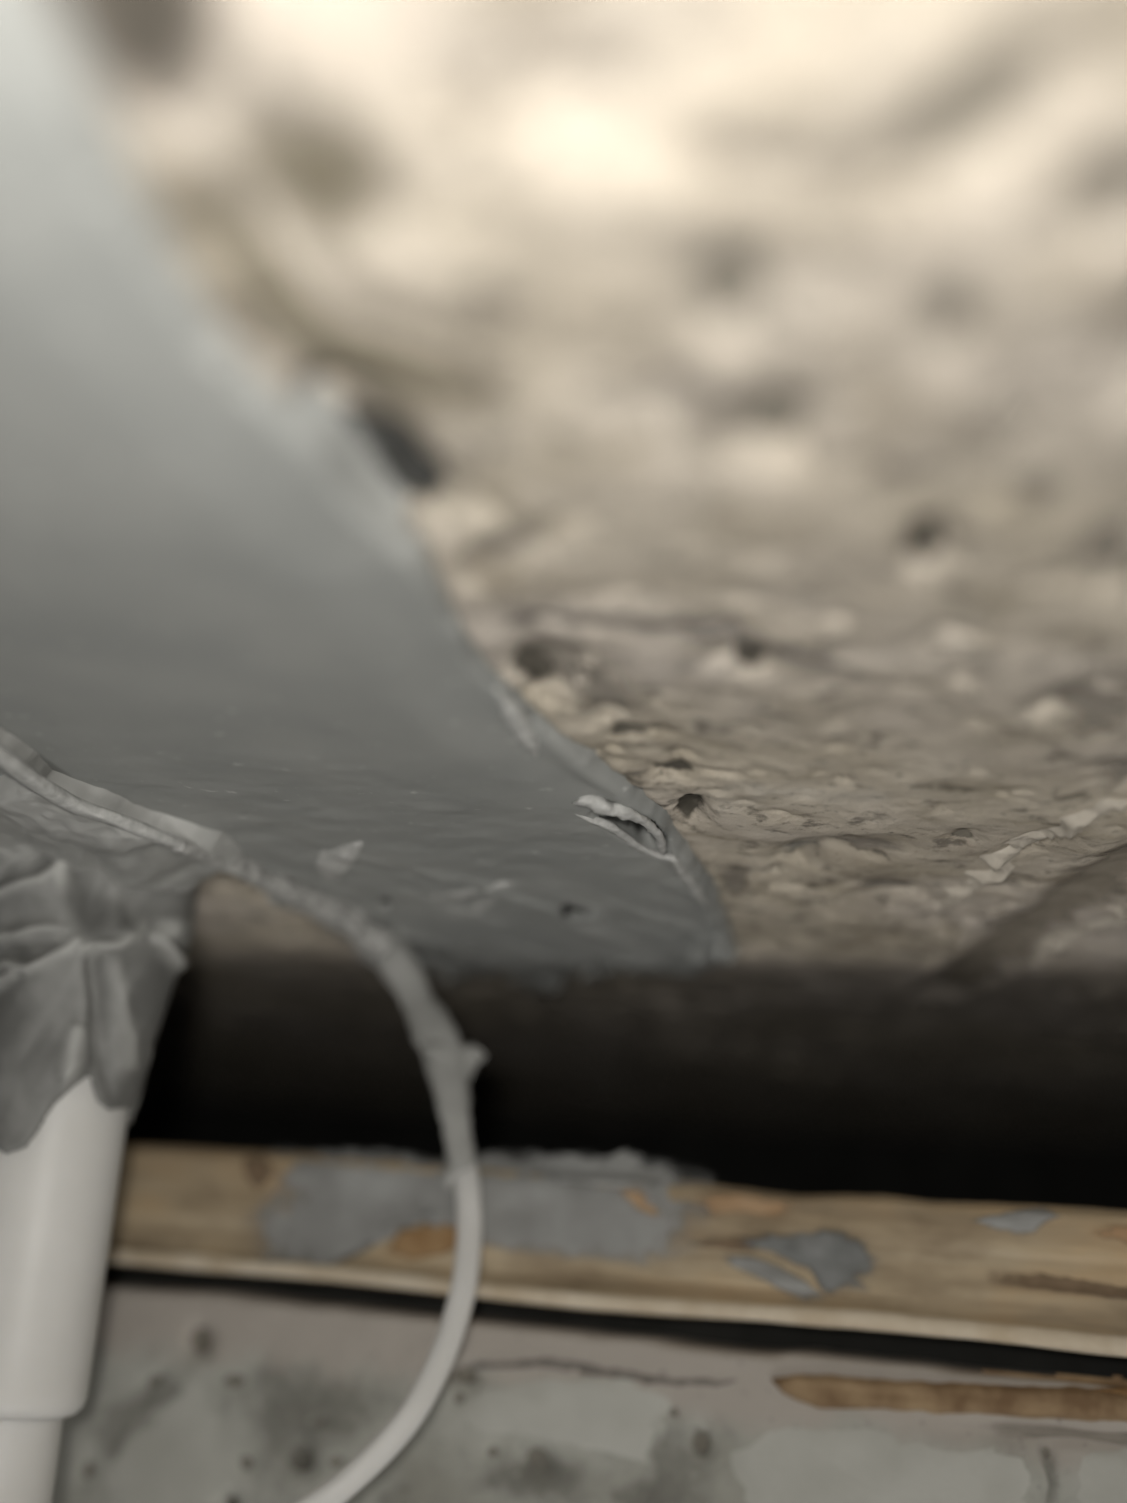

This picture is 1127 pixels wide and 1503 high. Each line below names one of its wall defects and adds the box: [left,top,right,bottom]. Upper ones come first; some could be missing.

spalling [513,641,662,735]